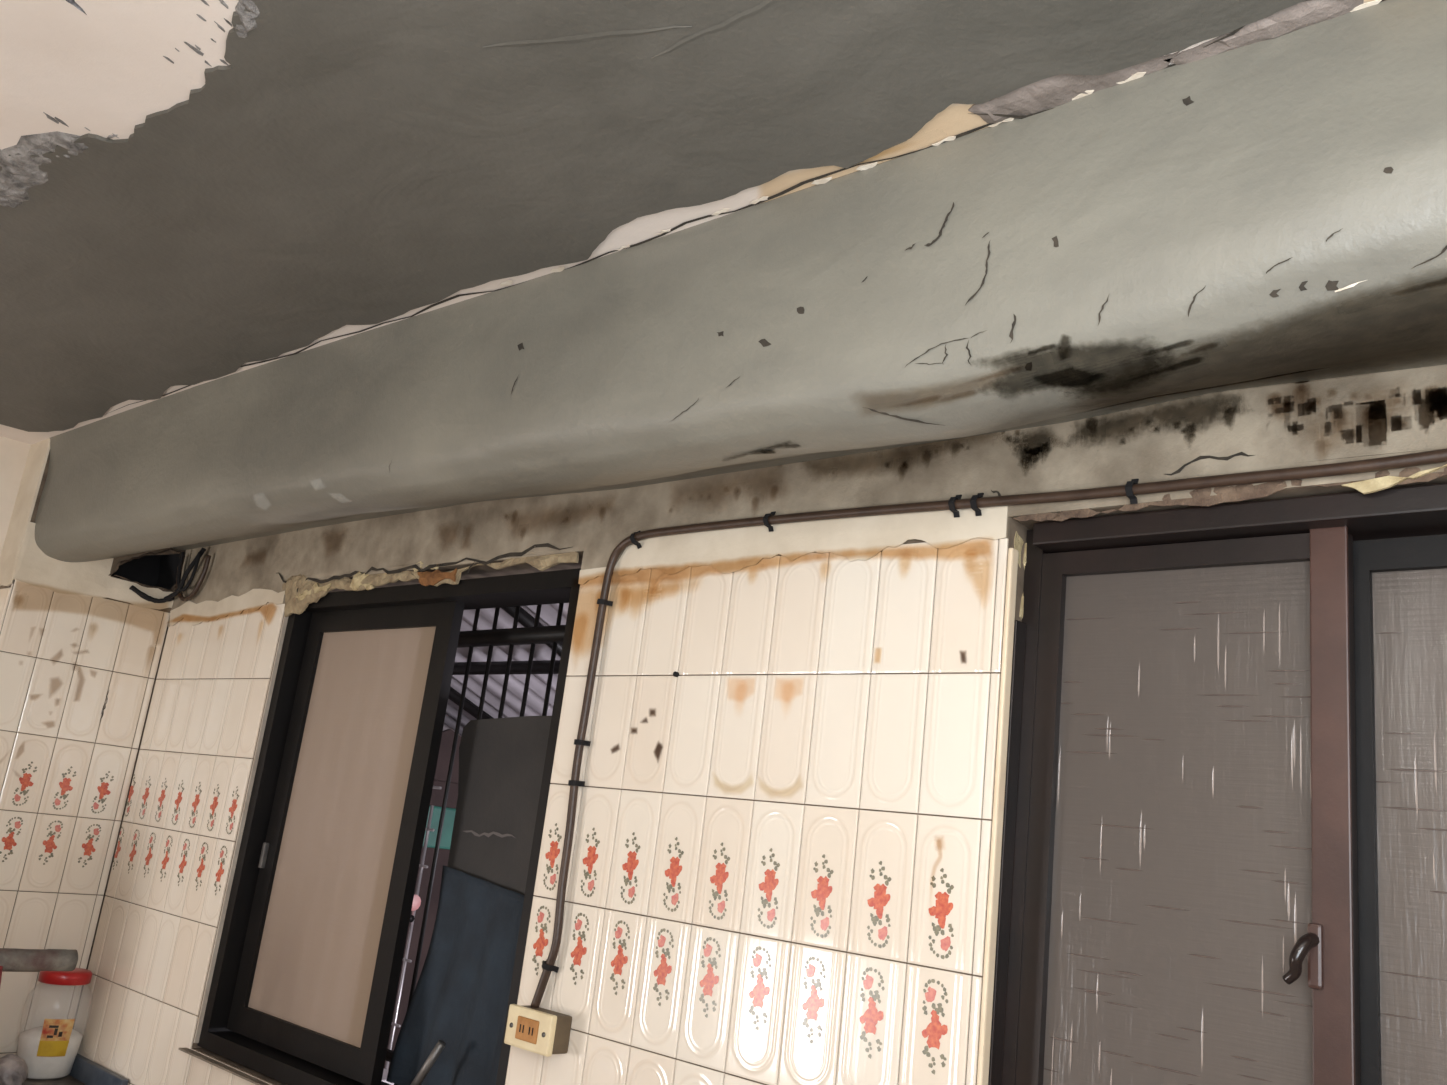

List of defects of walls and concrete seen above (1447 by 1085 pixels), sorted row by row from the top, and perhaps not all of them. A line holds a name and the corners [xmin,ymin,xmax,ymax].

spalling [968,0,1364,123]
crack [1413,245,1447,268]
crack [1188,285,1206,317]
spalling [1325,280,1366,292]
leakage [995,336,1200,393]
crack [863,407,940,425]
leakage [1080,398,1238,443]
leakage [1008,434,1056,468]
flaking render [1012,464,1447,570]
flaking render [282,552,579,617]